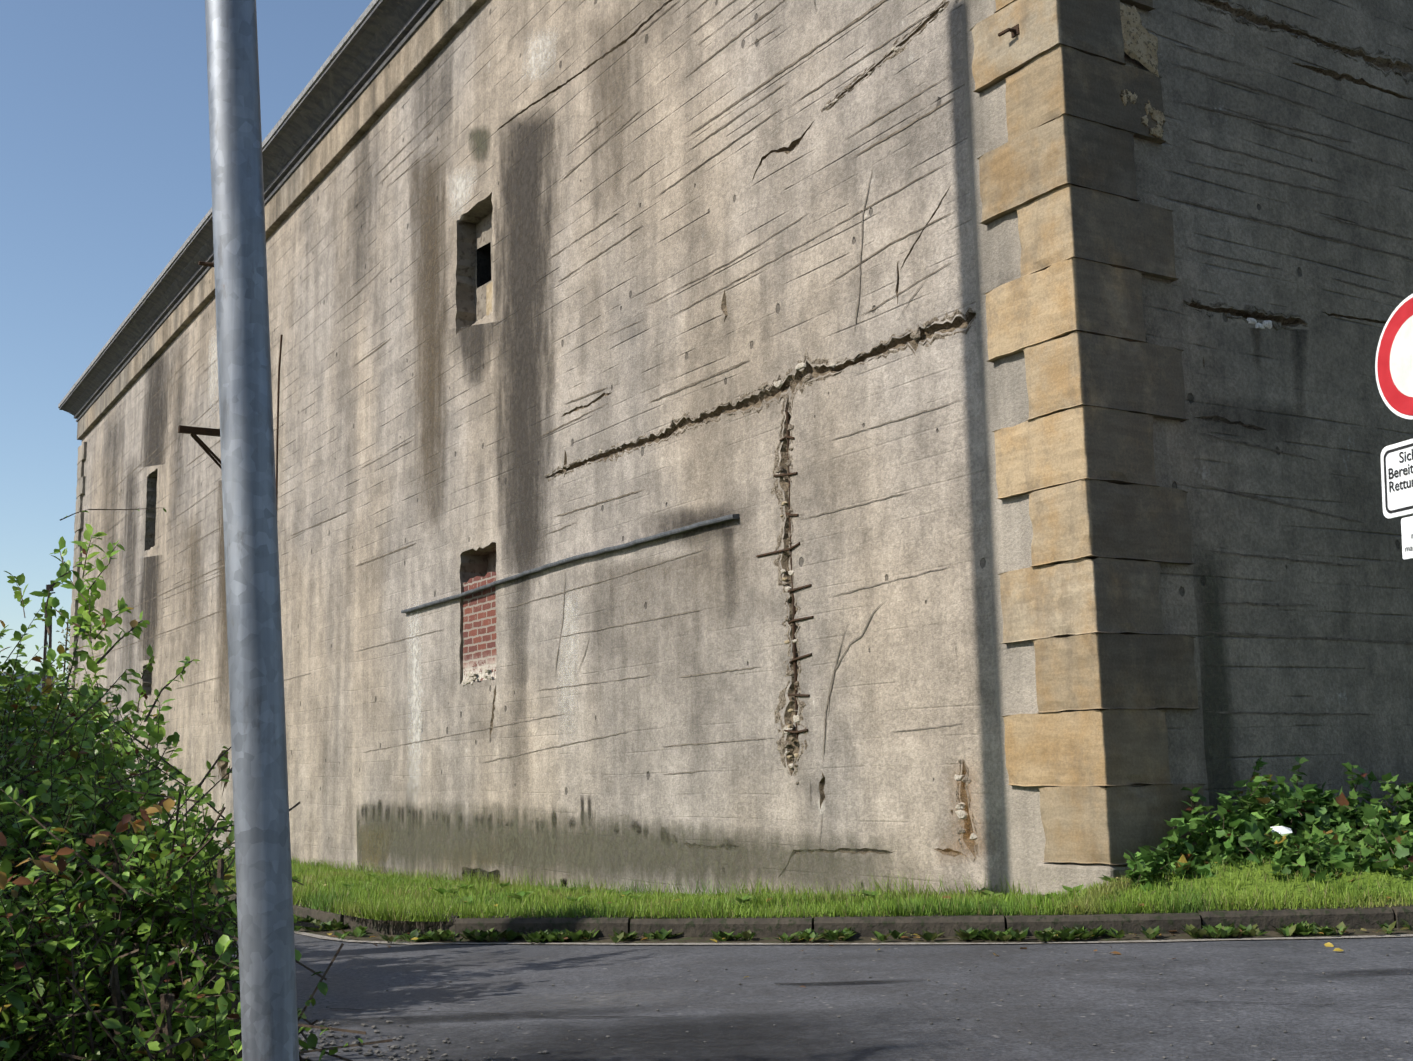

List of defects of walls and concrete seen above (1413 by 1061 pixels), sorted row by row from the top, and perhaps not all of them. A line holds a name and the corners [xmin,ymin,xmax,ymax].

spalling [1120,3,1159,77]
crack [752,120,815,181]
spalling [1121,89,1165,138]
leakage [413,120,554,589]
crack [544,167,976,482]
crack [1183,298,1387,331]
leakage [356,798,861,891]
spalling [934,759,978,861]